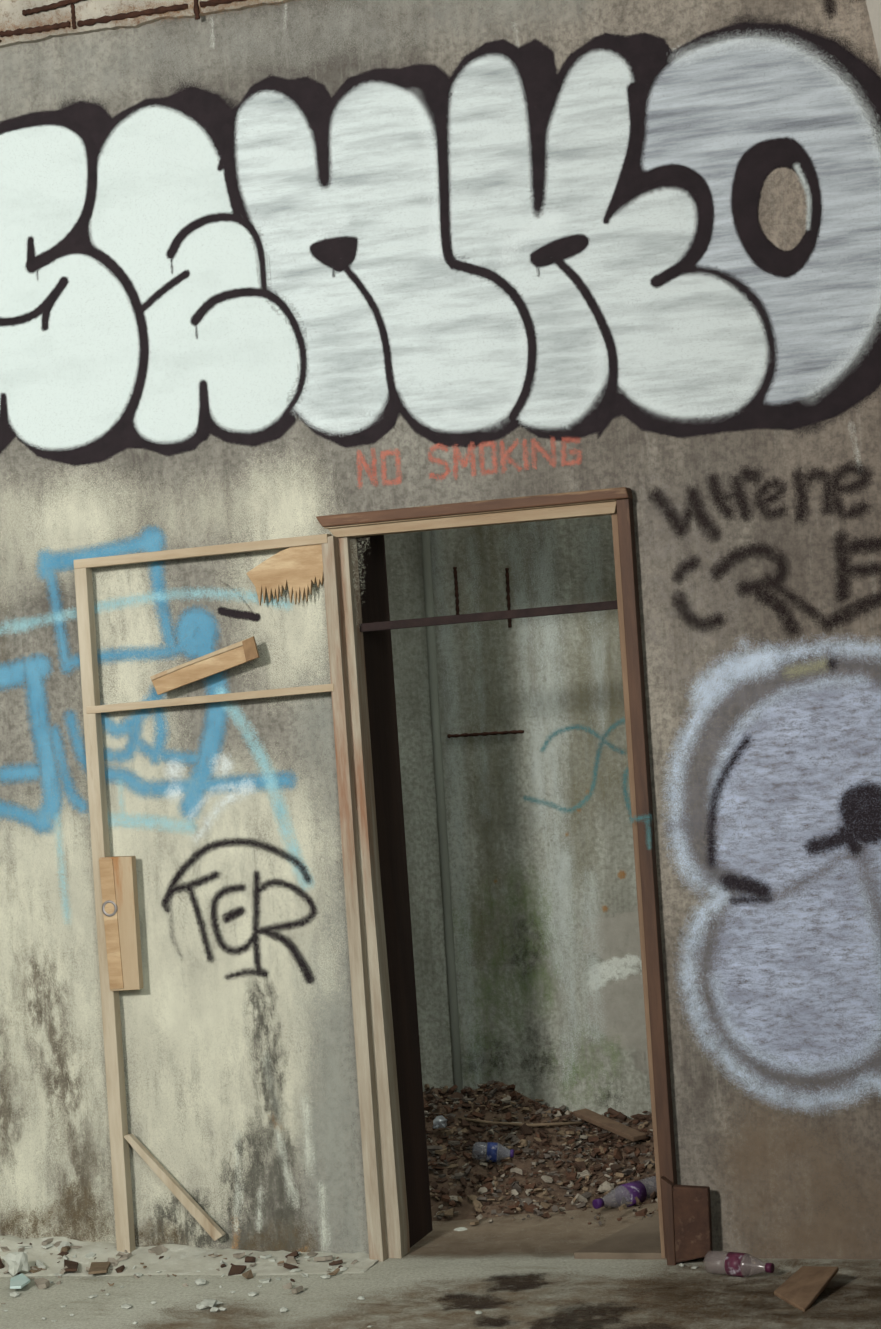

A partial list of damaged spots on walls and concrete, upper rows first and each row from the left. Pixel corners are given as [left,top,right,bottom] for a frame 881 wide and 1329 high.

corrosion [0,10,82,43]
spalling [0,0,247,43]
corrosion [109,0,290,29]
water stain [134,581,369,1254]
water stain [0,853,116,1243]
water stain [110,1203,881,1329]